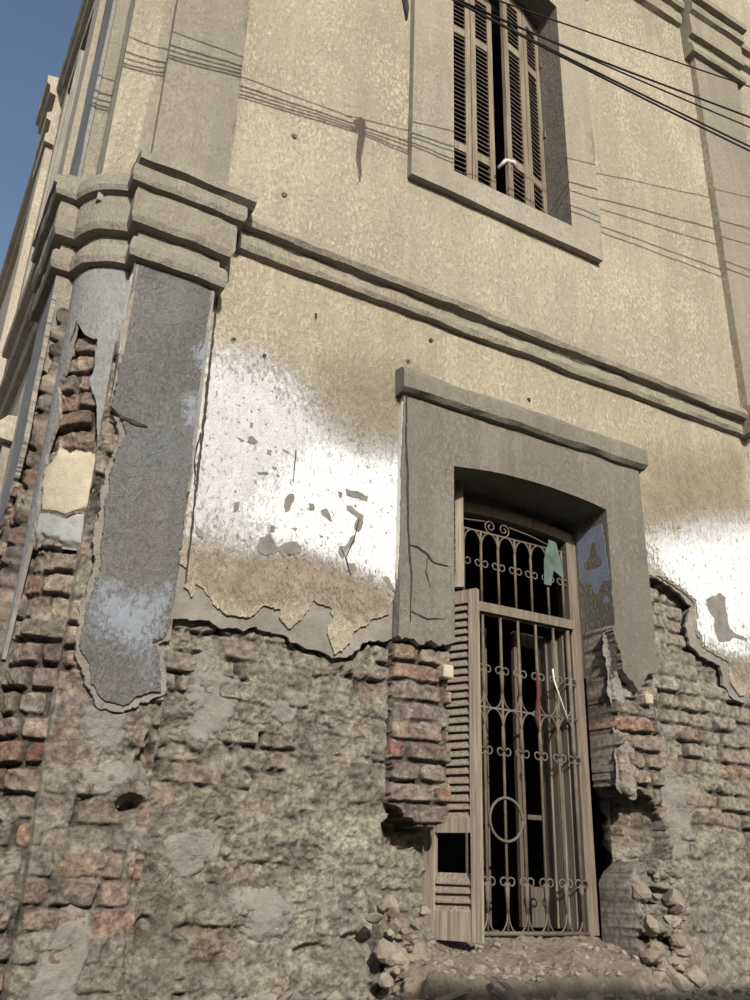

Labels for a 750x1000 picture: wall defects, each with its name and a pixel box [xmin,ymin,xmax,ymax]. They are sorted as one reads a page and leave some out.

crack [186,296,218,581]
spalling [0,274,454,1000]
crack [406,394,448,621]
peeling [576,523,610,603]
spalling [583,579,750,994]